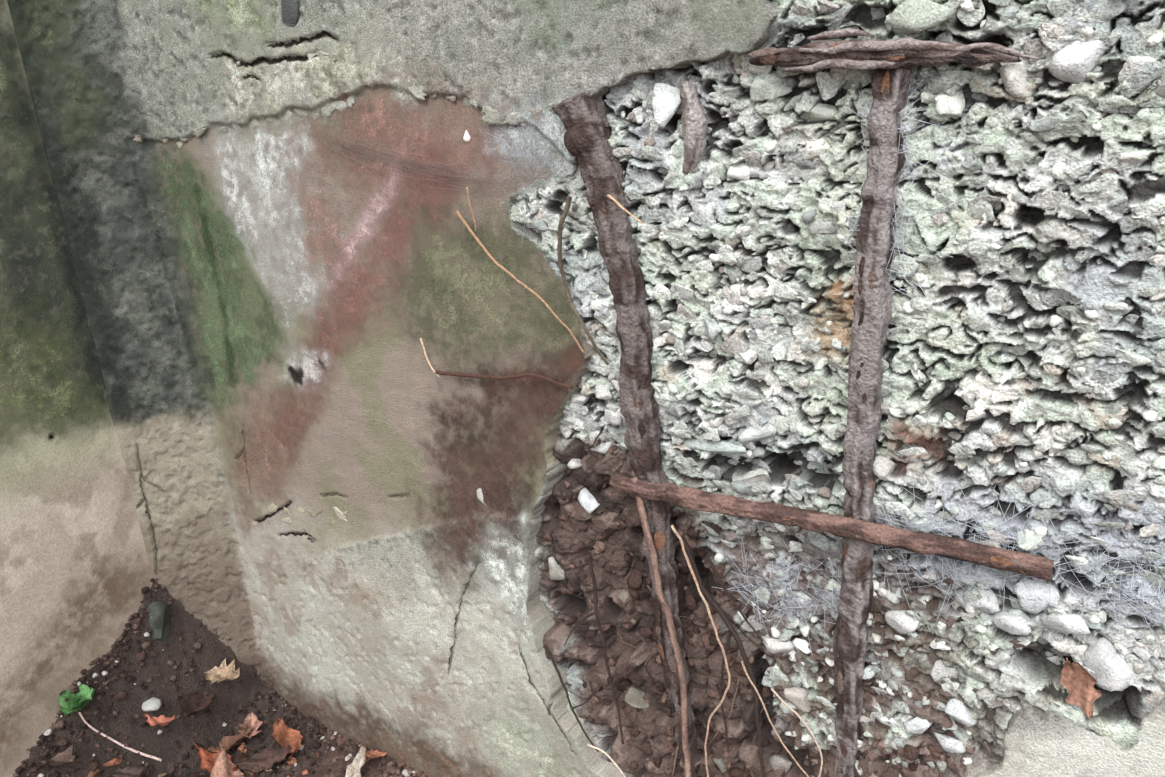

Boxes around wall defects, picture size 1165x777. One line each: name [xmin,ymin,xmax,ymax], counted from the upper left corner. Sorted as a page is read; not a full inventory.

crack [211,30,338,80]
water stain [214,34,574,523]
corrosion [817,282,854,354]
spalling [408,0,1165,777]
corrosion [891,422,940,466]
water stain [483,540,534,639]
corrosion [863,601,947,709]
corrosion [910,578,950,641]